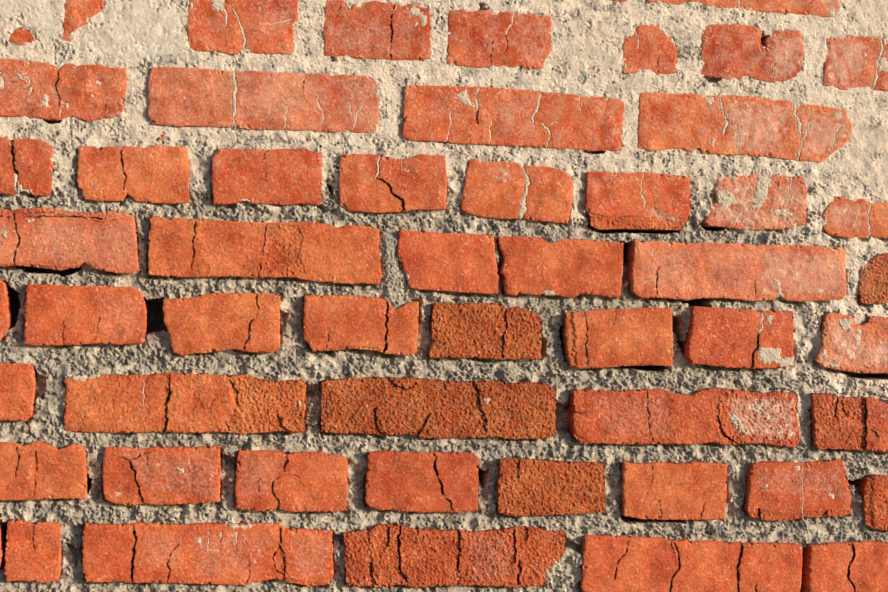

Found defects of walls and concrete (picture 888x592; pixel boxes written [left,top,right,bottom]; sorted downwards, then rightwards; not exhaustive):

crack [474,87,492,143]
crack [530,91,559,148]
crack [0,149,117,266]
crack [375,156,406,211]
crack [518,166,530,219]
crack [835,396,878,449]
crack [129,523,137,579]
crack [388,527,408,582]
crack [514,529,528,585]
crack [669,543,681,592]
crack [736,541,757,592]
crack [847,542,855,592]